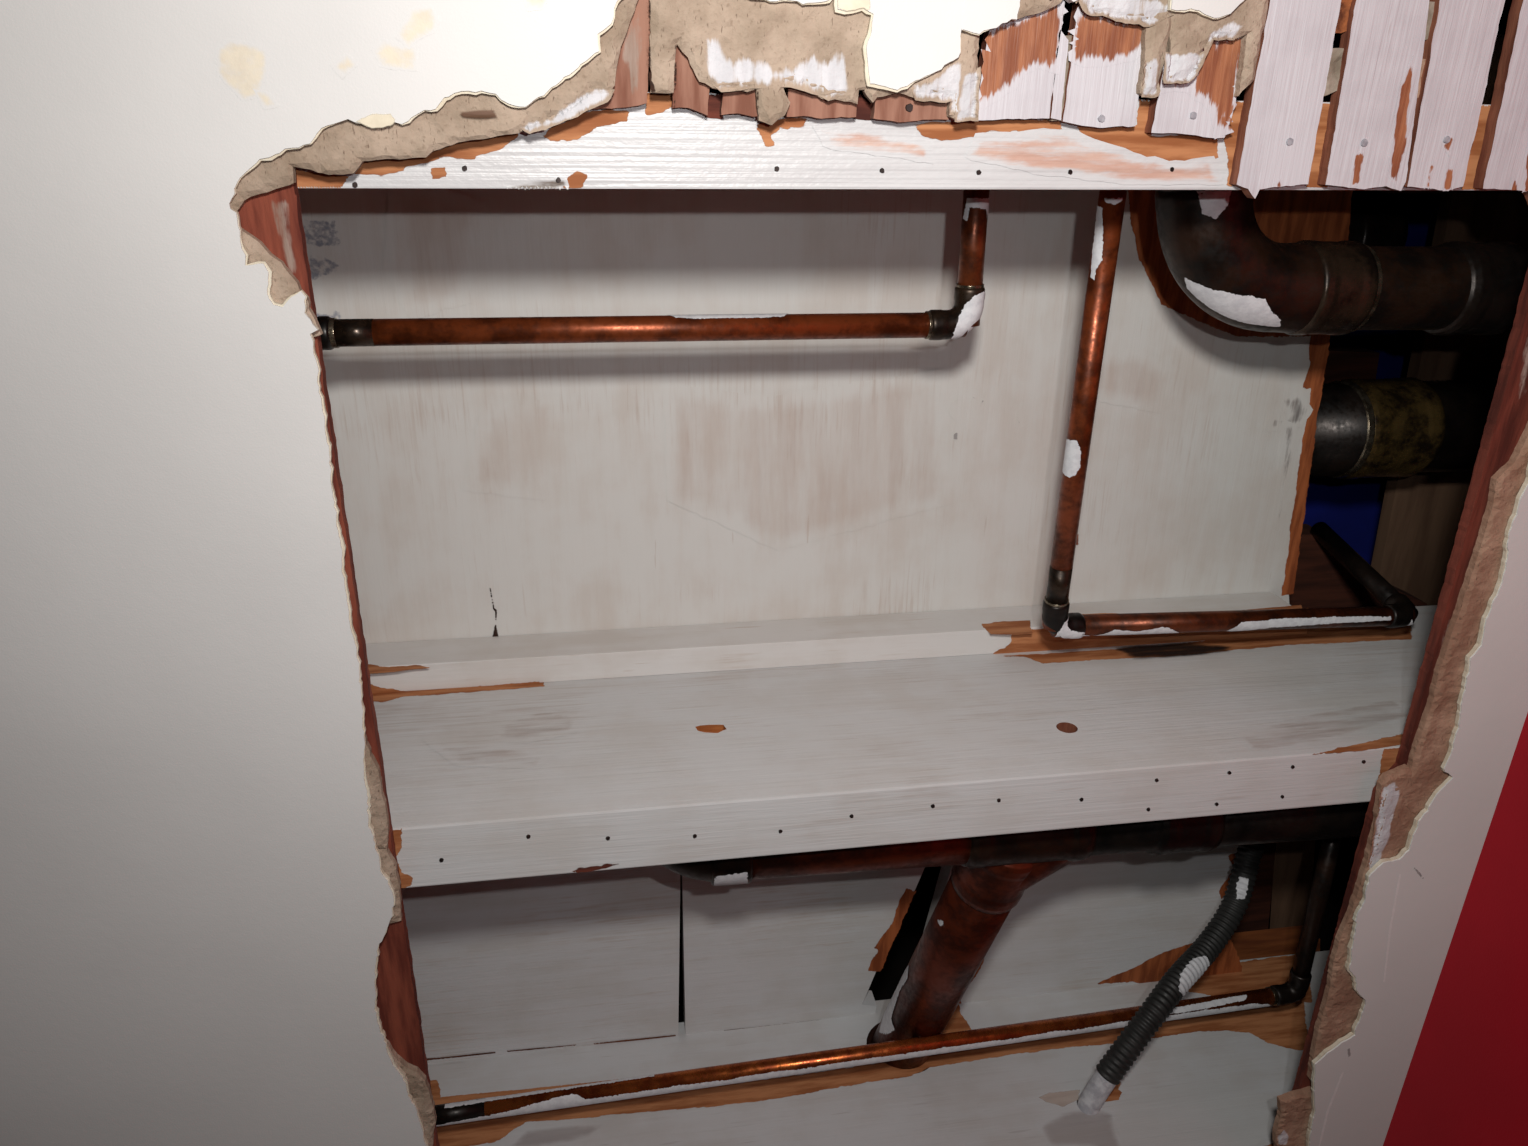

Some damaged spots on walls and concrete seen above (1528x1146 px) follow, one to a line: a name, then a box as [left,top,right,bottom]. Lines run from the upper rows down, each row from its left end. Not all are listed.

peeling [1253,103,1367,243]
peeling [1388,53,1414,189]
peeling [1424,105,1490,191]
flaking render [231,0,1331,610]
peeling [368,664,545,702]
crack [490,588,498,637]
peeling [982,620,1412,664]
flaking render [365,732,413,924]
flaking render [1151,422,1528,1146]
peeling [868,888,916,972]
peeling [1098,943,1192,984]
peeling [388,1027,1124,1146]